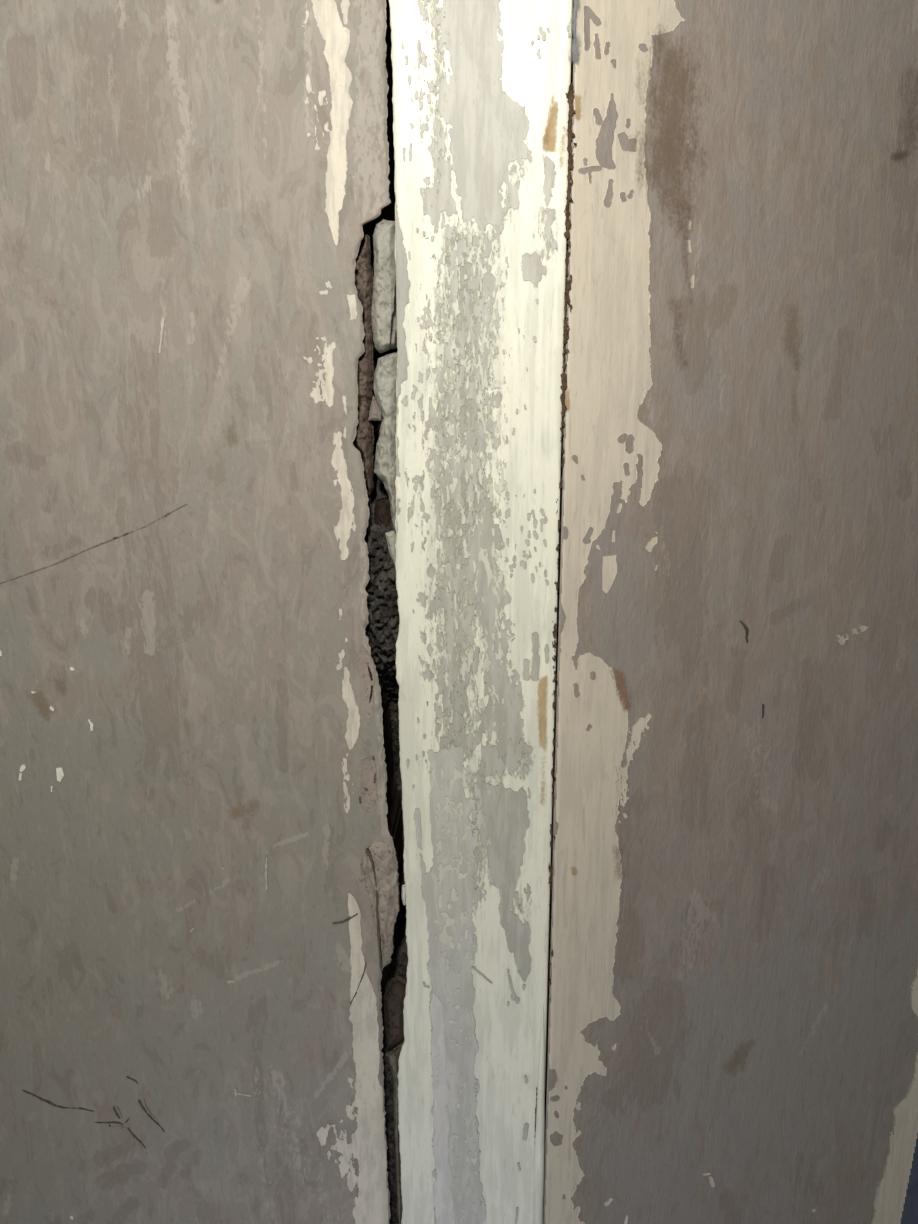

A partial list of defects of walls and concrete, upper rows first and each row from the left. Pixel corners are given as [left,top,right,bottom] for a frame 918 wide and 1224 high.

peeling [302,0,353,246]
crack [0,504,187,584]
peeling [303,336,356,560]
peeling [347,294,357,320]
peeling [368,395,382,421]
crack [350,6,408,1224]
peeling [385,0,685,1224]
rust [538,83,580,806]